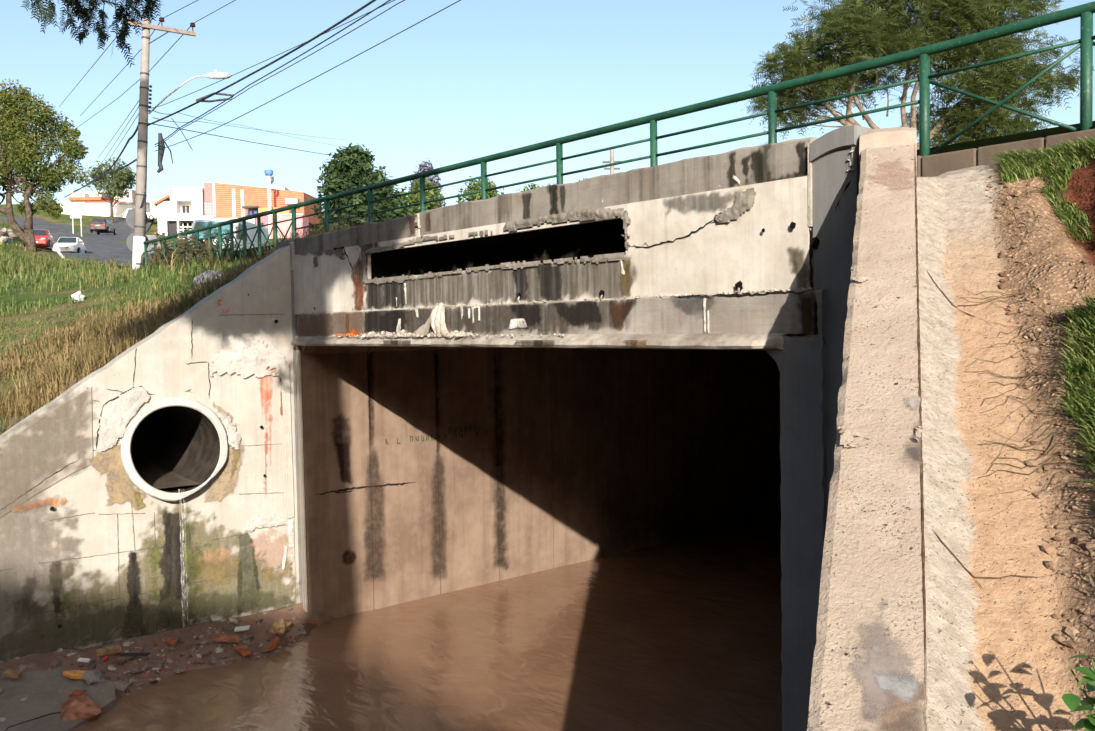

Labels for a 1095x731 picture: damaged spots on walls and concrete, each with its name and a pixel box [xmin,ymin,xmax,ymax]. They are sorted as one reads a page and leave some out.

spalling [361,207,631,285]
crack [631,220,716,248]
leakage [364,254,636,345]
spalling [99,387,150,451]
leakage [0,397,294,661]
leakage [332,416,350,482]
leakage [343,453,383,578]
crack [316,482,416,495]
leakage [433,441,445,575]
leakage [494,359,508,567]
leakage [853,626,927,731]